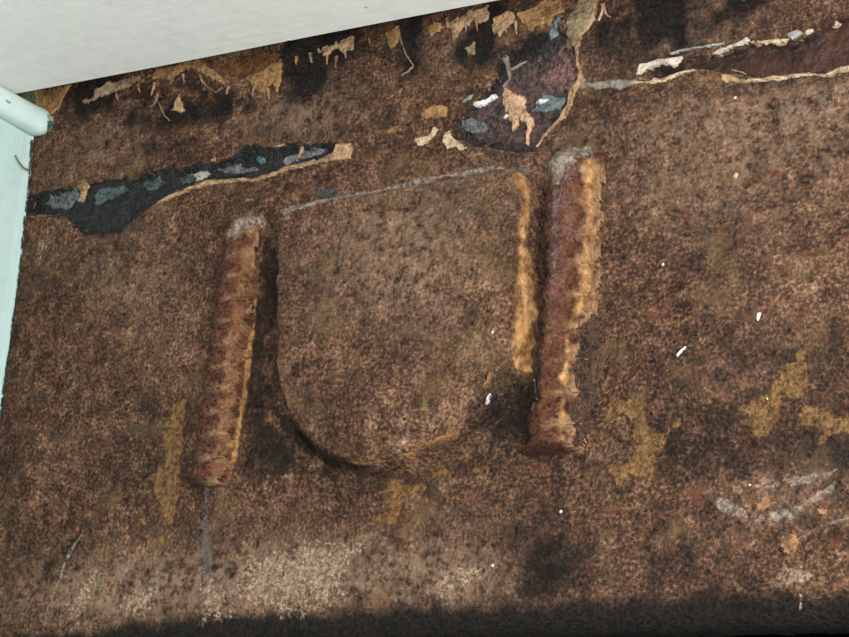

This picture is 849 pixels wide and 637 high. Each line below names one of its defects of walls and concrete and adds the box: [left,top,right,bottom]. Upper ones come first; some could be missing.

flaking render [40,83,72,133]
flaking render [82,59,230,121]
flaking render [308,35,355,68]
flaking render [385,25,414,76]
flaking render [414,0,611,152]
flaking render [632,15,849,85]
corrosion [576,159,599,315]
flaking render [0,140,354,426]
corrosion [226,297,257,477]
corrosion [559,335,569,397]